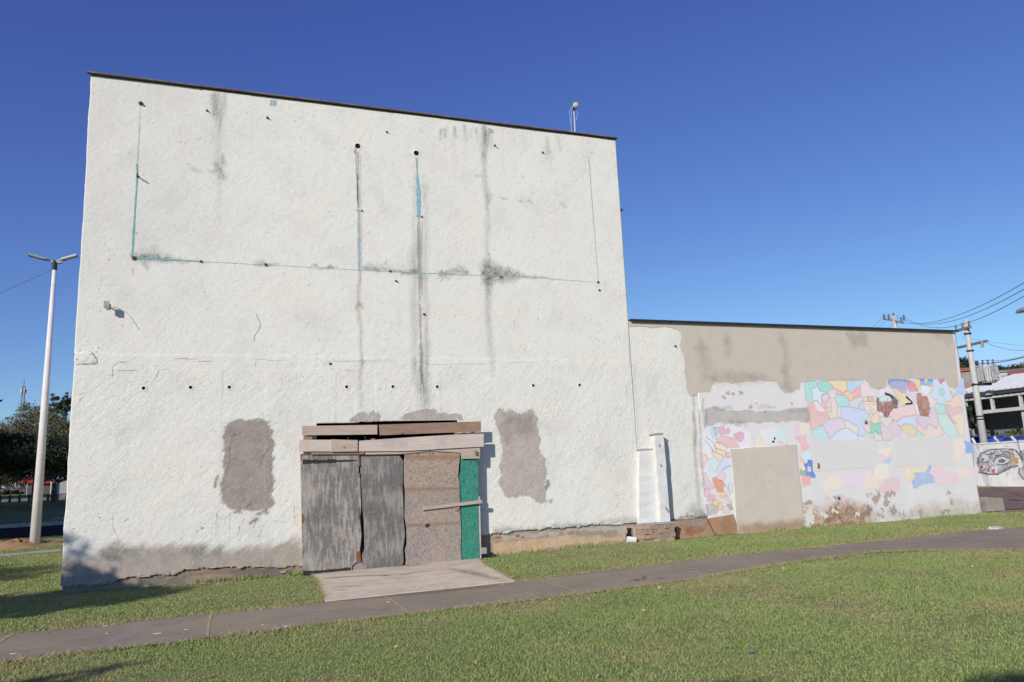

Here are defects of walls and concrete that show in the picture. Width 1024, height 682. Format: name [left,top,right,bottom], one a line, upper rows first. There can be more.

spalling [803,491,897,528]